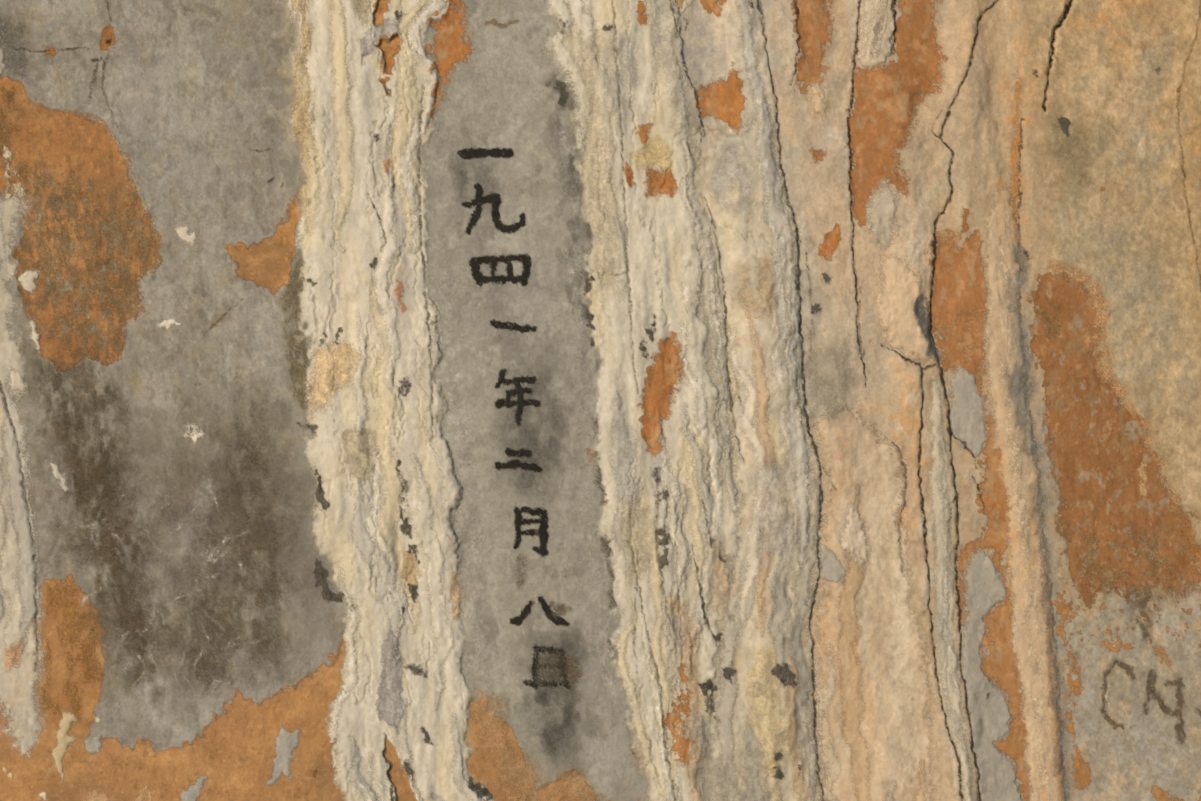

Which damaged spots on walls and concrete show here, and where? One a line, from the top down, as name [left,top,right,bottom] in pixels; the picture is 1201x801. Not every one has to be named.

crack [1018,0,1072,320]
peeling [0,76,162,372]
peeling [175,226,196,246]
peeling [226,195,302,295]
peeling [158,319,181,329]
crack [847,2,996,799]
peeling [947,367,987,458]
peeling [50,463,69,491]
peeling [0,574,347,801]
peeling [383,735,417,801]
peeling [466,693,596,801]